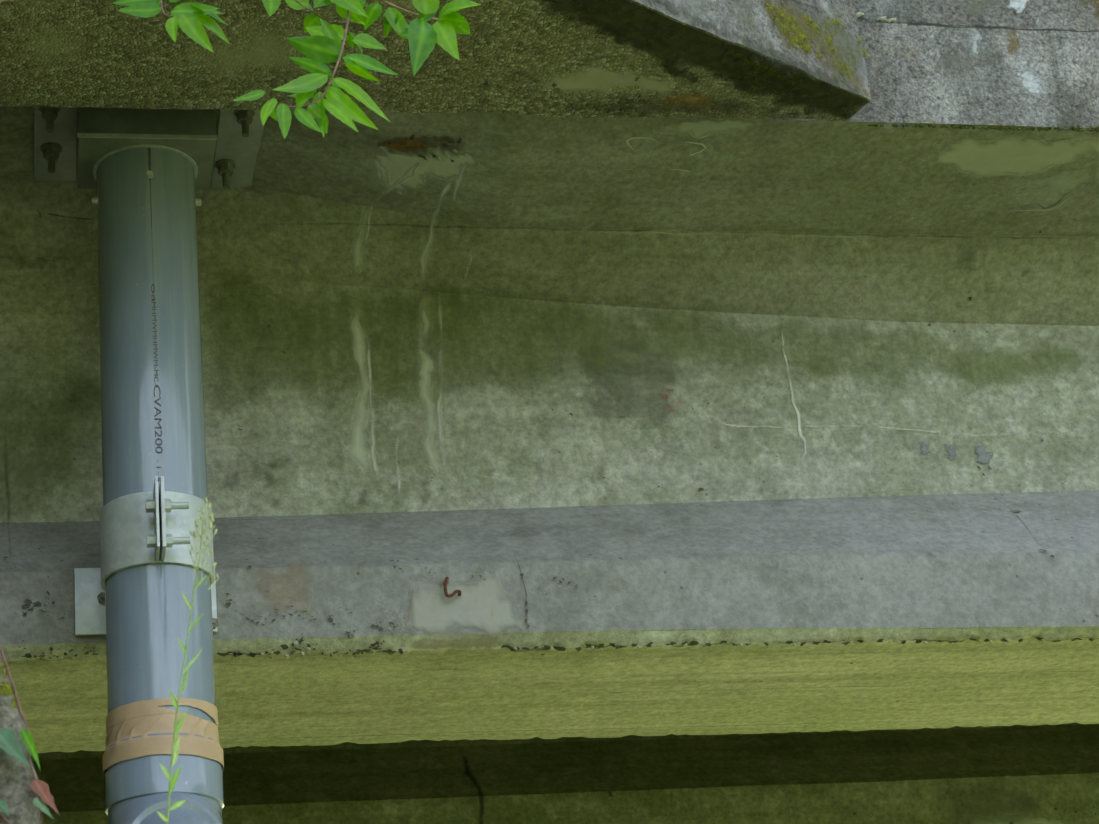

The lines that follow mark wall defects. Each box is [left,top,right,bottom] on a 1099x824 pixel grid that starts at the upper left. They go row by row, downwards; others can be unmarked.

efflorescence [370,145,476,273]
efflorescence [351,316,376,470]
efflorescence [421,353,441,466]
crack [782,335,806,457]
crack [464,757,483,824]